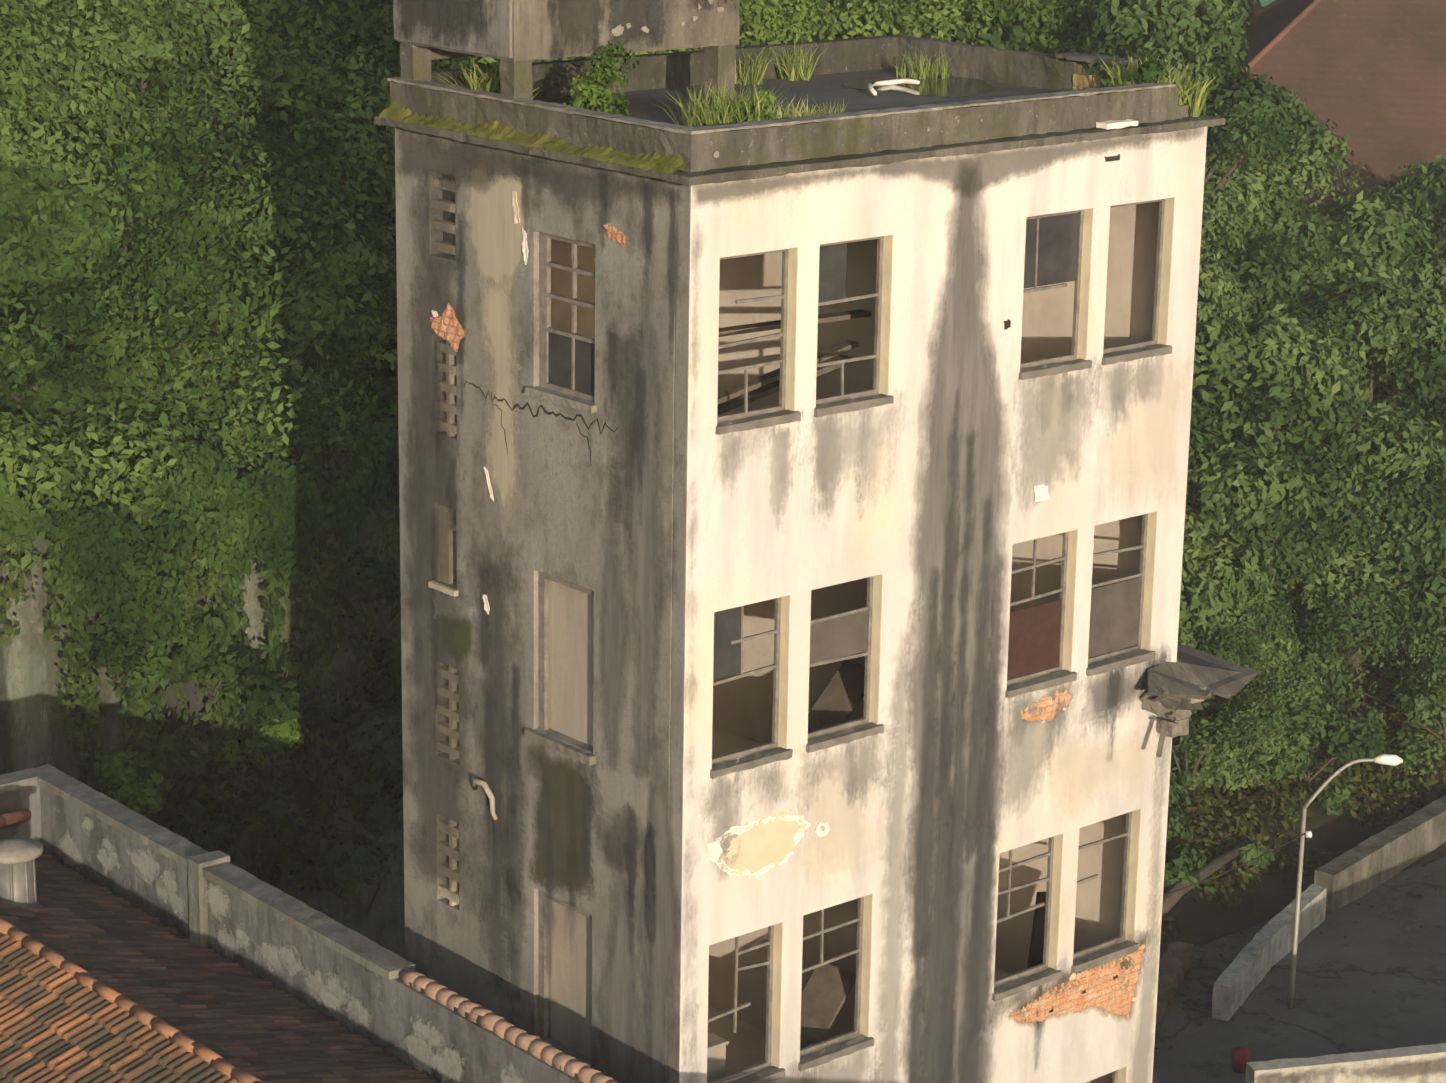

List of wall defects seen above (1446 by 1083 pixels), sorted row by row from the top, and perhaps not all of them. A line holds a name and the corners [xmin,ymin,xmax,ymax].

leakage [398,0,487,46]
leakage [548,0,665,58]
leakage [668,193,677,332]
flaking render [430,303,466,352]
peeling [463,166,529,520]
crack [464,381,618,463]
leakage [904,166,1066,1083]
leakage [600,274,677,1083]
flaking render [1021,689,1071,723]
leakage [485,667,593,973]
peeling [707,811,830,880]
flaking render [1009,944,1145,1025]